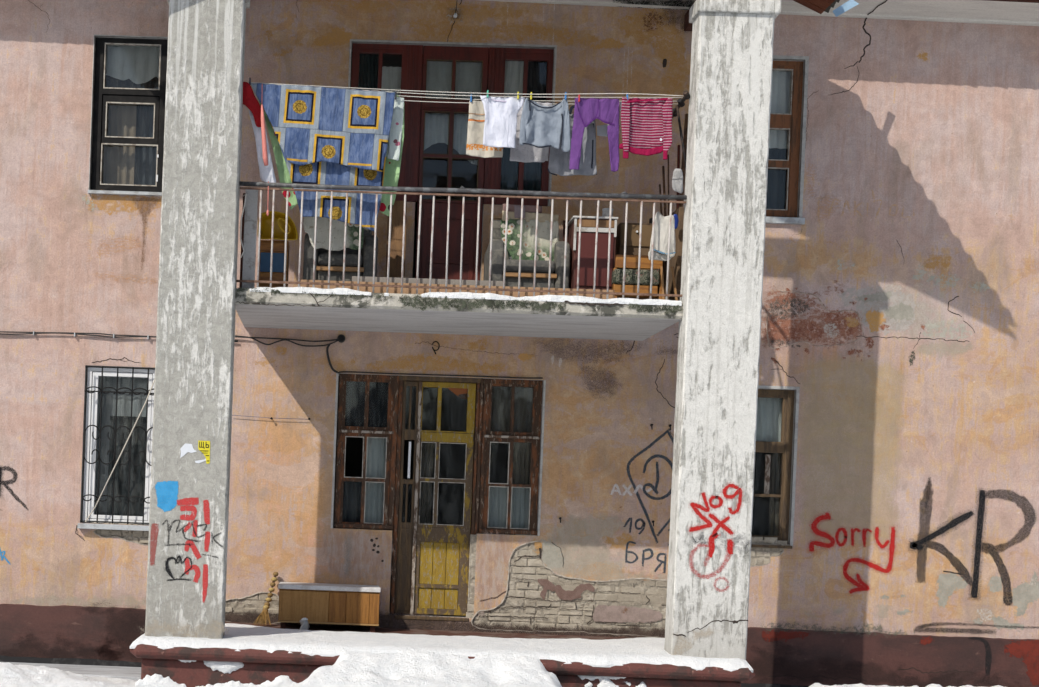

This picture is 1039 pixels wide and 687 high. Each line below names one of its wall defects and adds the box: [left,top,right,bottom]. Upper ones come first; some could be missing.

crack [805,0,887,148]
water stain [82,189,162,286]
spalling [760,281,874,365]
crack [857,296,975,349]
water stain [529,337,643,400]
crack [655,359,675,434]
spalling [466,529,721,655]